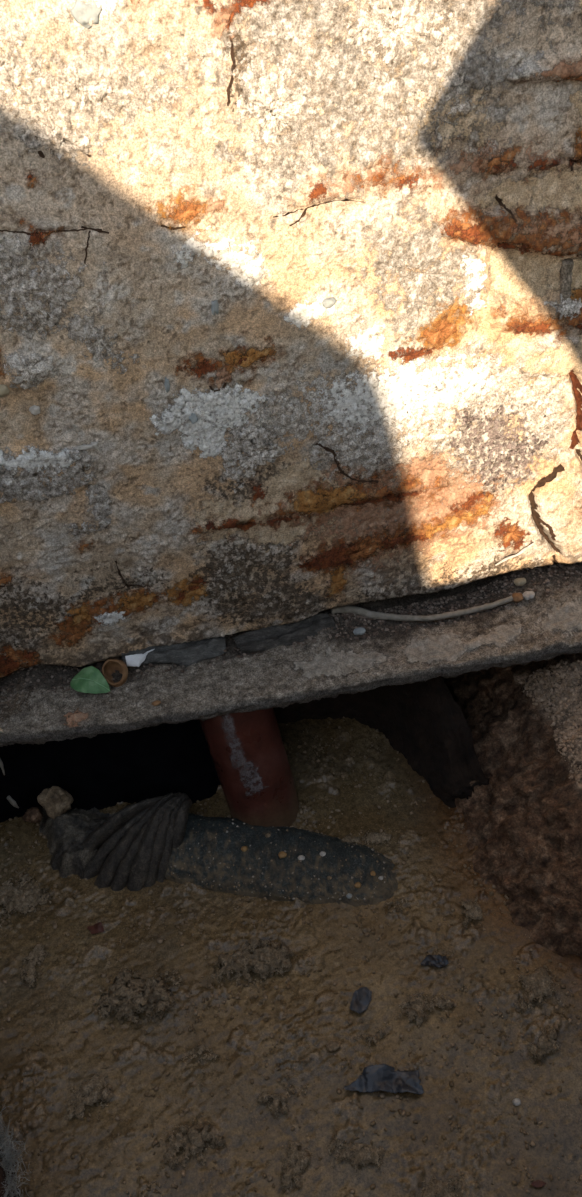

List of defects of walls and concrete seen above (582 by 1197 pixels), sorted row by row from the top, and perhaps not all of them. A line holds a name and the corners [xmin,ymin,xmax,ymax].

rust [147,184,228,232]
rust [307,78,582,258]
rust [175,331,282,389]
rust [491,286,582,343]
crack [529,370,582,563]
rust [191,448,534,597]
rust [0,574,209,678]